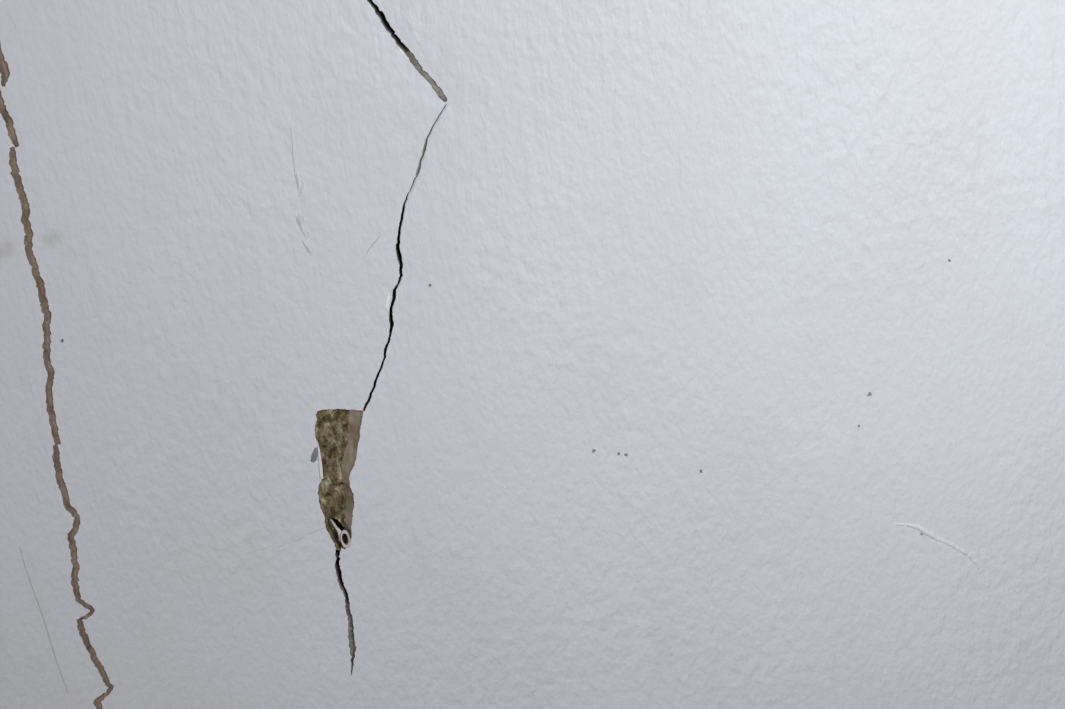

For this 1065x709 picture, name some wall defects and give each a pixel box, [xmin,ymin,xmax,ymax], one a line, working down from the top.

crack [0,43,114,709]
crack [290,128,313,256]
flaking render [311,409,363,551]
crack [362,0,447,411]